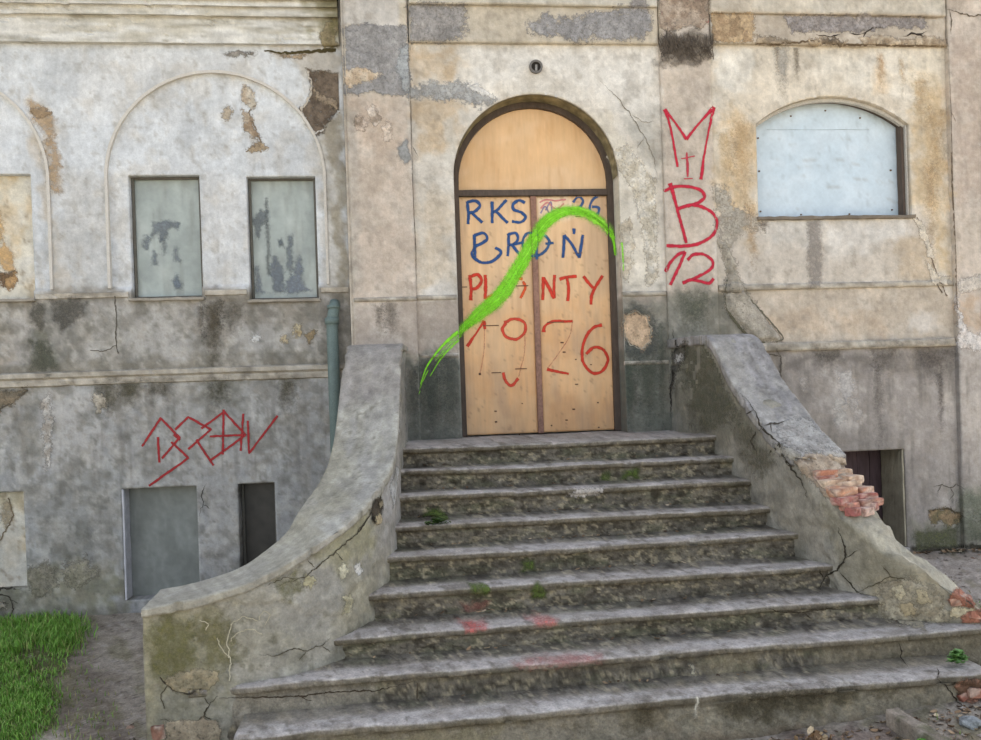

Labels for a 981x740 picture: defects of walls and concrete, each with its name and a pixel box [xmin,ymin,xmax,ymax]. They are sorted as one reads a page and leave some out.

crack [816,26,883,37]
peeling [221,84,269,153]
spalling [299,67,383,136]
crack [600,81,657,172]
crack [90,296,119,353]
spalling [619,305,657,357]
peeling [953,274,981,352]
spalling [0,385,28,409]
crack [740,395,807,497]
flaking render [772,417,884,517]
crack [269,512,371,588]
spalling [928,507,961,526]